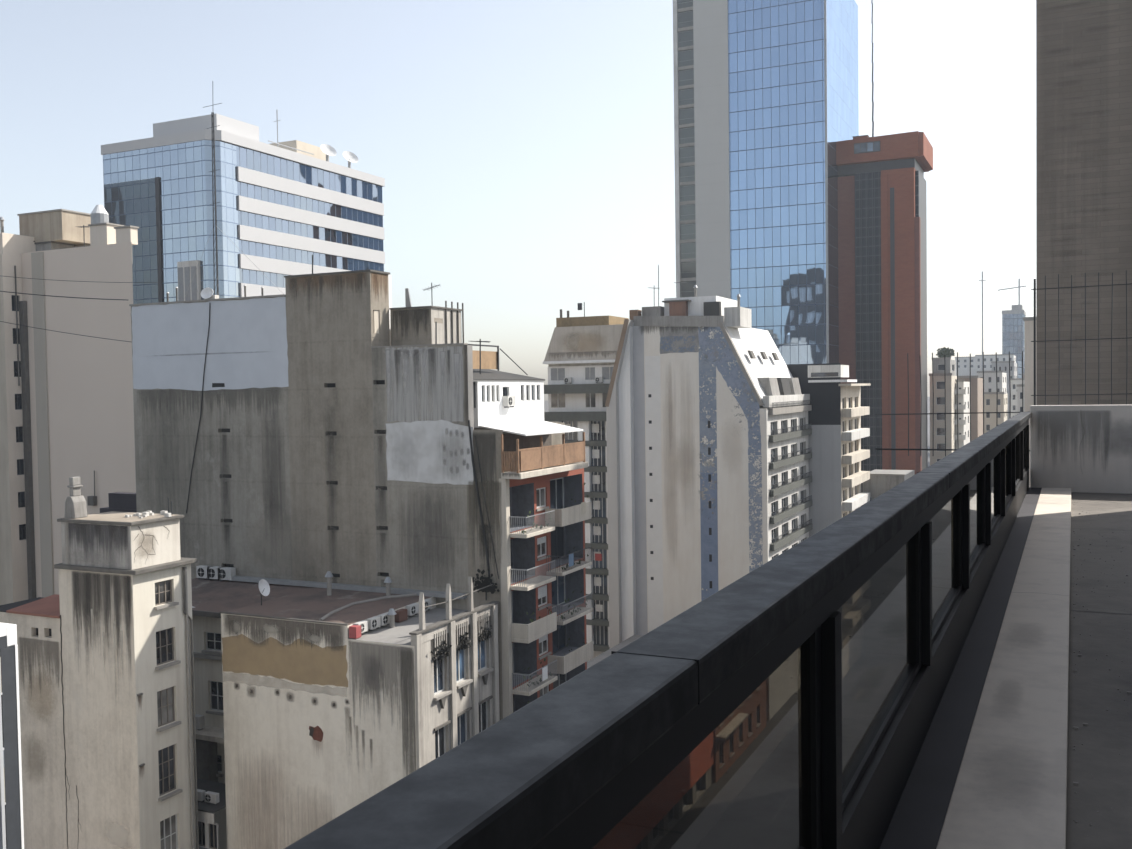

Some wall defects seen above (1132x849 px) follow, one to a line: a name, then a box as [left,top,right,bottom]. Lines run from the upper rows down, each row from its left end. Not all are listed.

peeling [700,445,718,601]
peeling [748,456,763,573]
crack [60,615,80,847]
water stain [73,572,130,648]
peeling [222,634,349,708]
water stain [226,615,416,775]